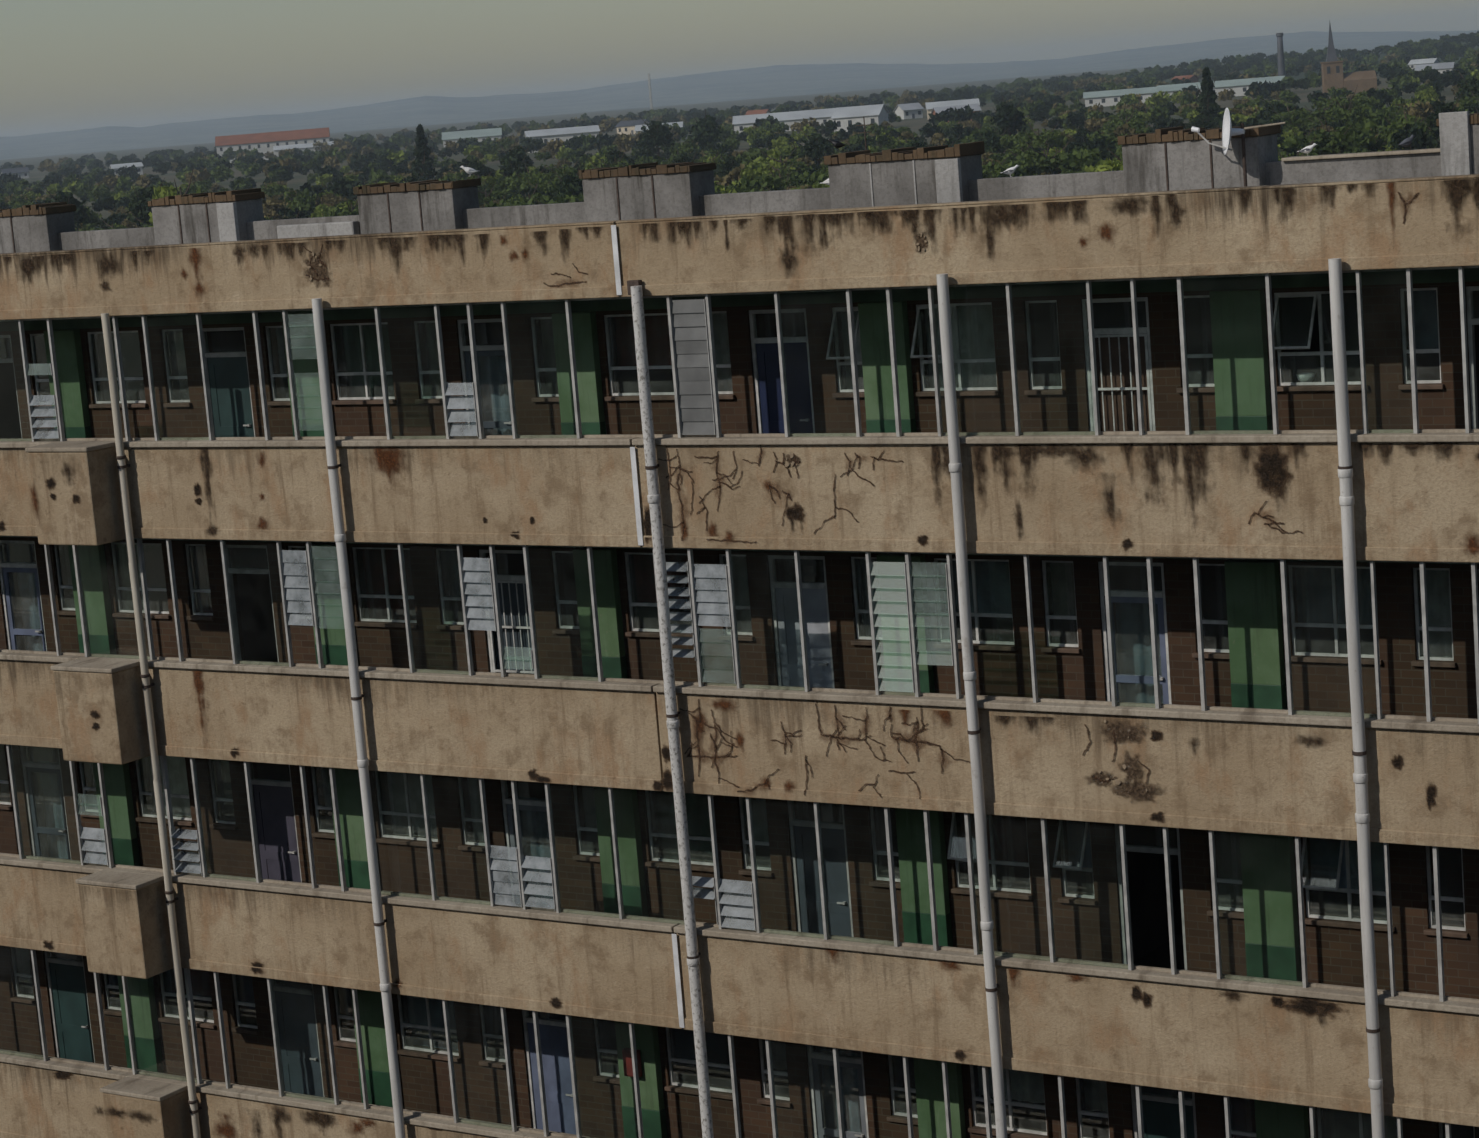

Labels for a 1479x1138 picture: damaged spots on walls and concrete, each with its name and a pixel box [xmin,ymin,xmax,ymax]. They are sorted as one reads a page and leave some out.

water stain [378,234,488,267]
crack [543,263,588,287]
water stain [642,210,896,271]
water stain [952,204,1028,256]
water stain [1113,194,1184,225]
rust [375,447,402,477]
crack [658,445,903,540]
water stain [972,444,1098,494]
water stain [1121,443,1207,509]
crack [1248,501,1302,534]
water stain [1359,442,1457,460]
crack [680,699,971,799]